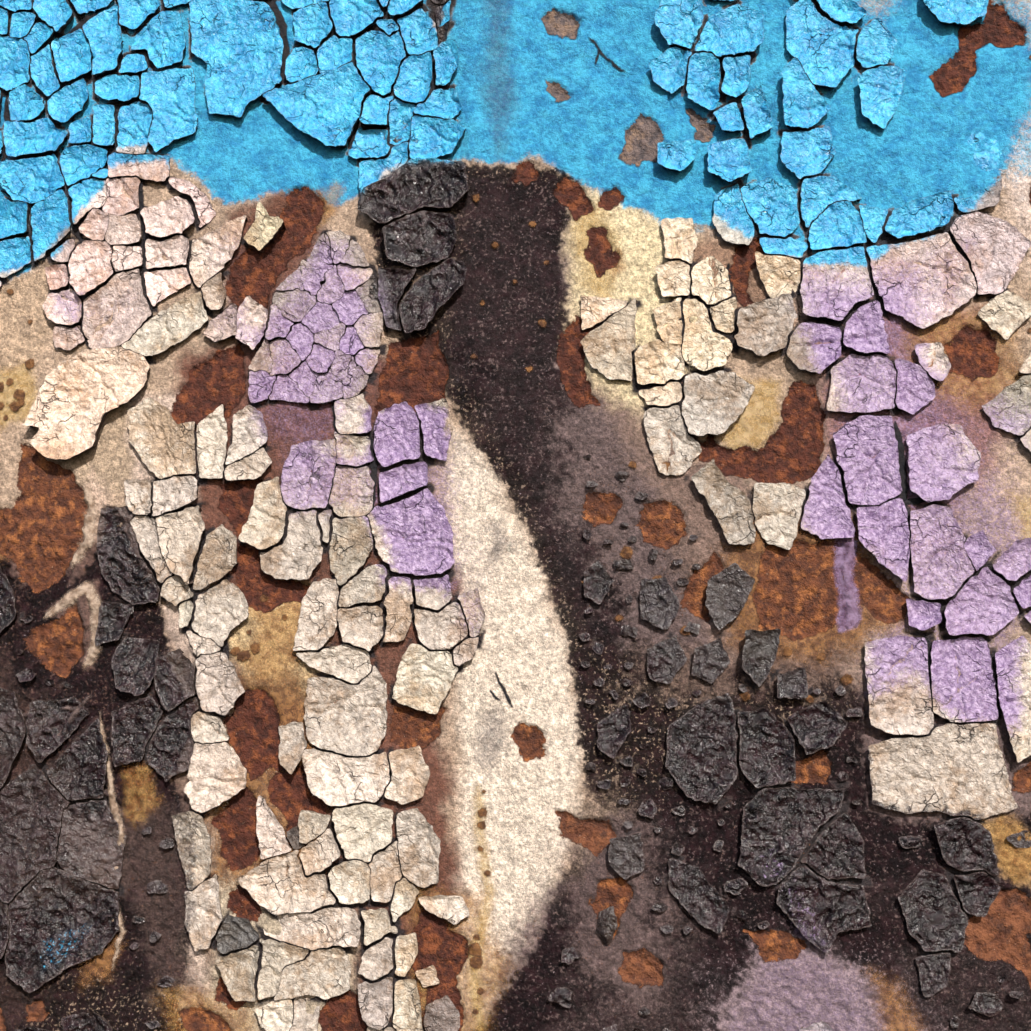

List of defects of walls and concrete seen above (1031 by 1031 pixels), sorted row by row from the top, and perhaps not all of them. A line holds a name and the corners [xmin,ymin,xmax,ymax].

peeling [923,0,989,26]
corrosion [929,0,1031,97]
peeling [263,62,370,148]
peeling [244,201,286,251]
corrosion [225,186,326,309]
peeling [22,291,209,460]
corrosion [170,342,246,431]
corrosion [0,443,97,594]
crack [0,0,485,1031]
corrosion [23,582,101,678]
crack [490,672,513,707]
peeling [415,965,440,987]